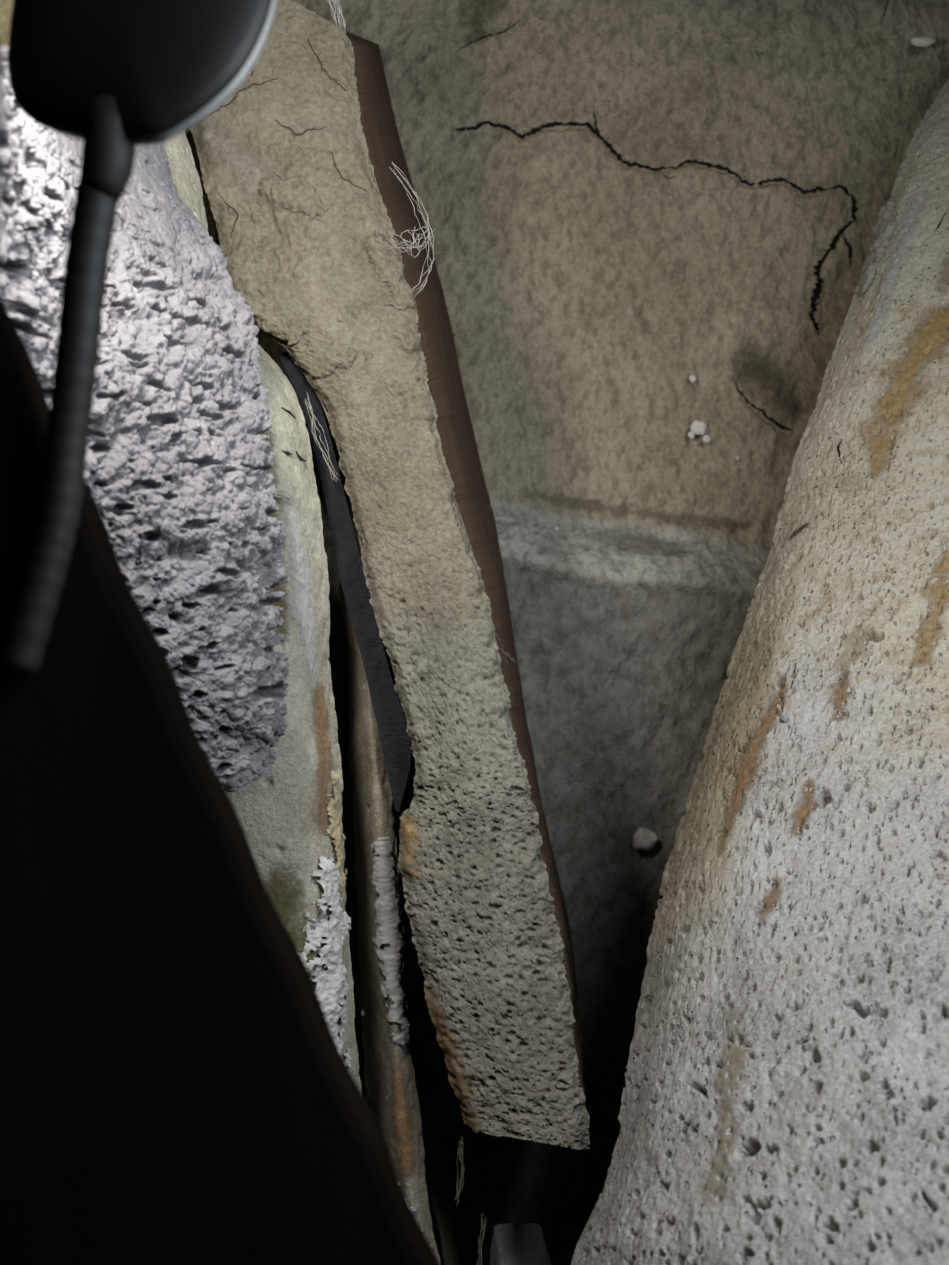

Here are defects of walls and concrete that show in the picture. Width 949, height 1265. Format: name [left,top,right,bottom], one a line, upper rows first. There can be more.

crack [454,111,858,335]
corrosion [864,307,949,475]
corrosion [718,684,788,853]
damp [265,870,313,978]